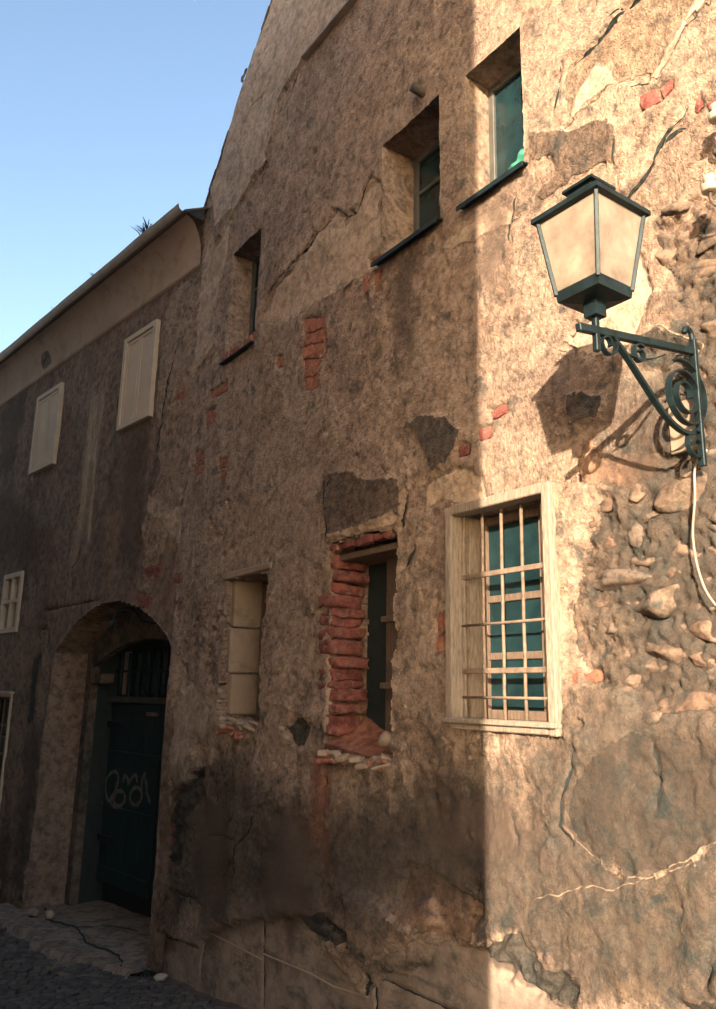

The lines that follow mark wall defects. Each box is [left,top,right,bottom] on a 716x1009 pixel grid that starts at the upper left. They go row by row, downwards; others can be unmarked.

crack [543,0,640,109]
flaking render [559,0,712,132]
flaking render [172,0,346,402]
flaking render [252,180,384,391]
crack [264,179,380,304]
crack [628,109,687,198]
flaking render [421,405,509,514]
flaking render [577,438,640,489]
crack [558,749,575,842]
flaking render [562,823,716,880]
crack [365,971,450,1009]
spalling [487,930,580,1009]